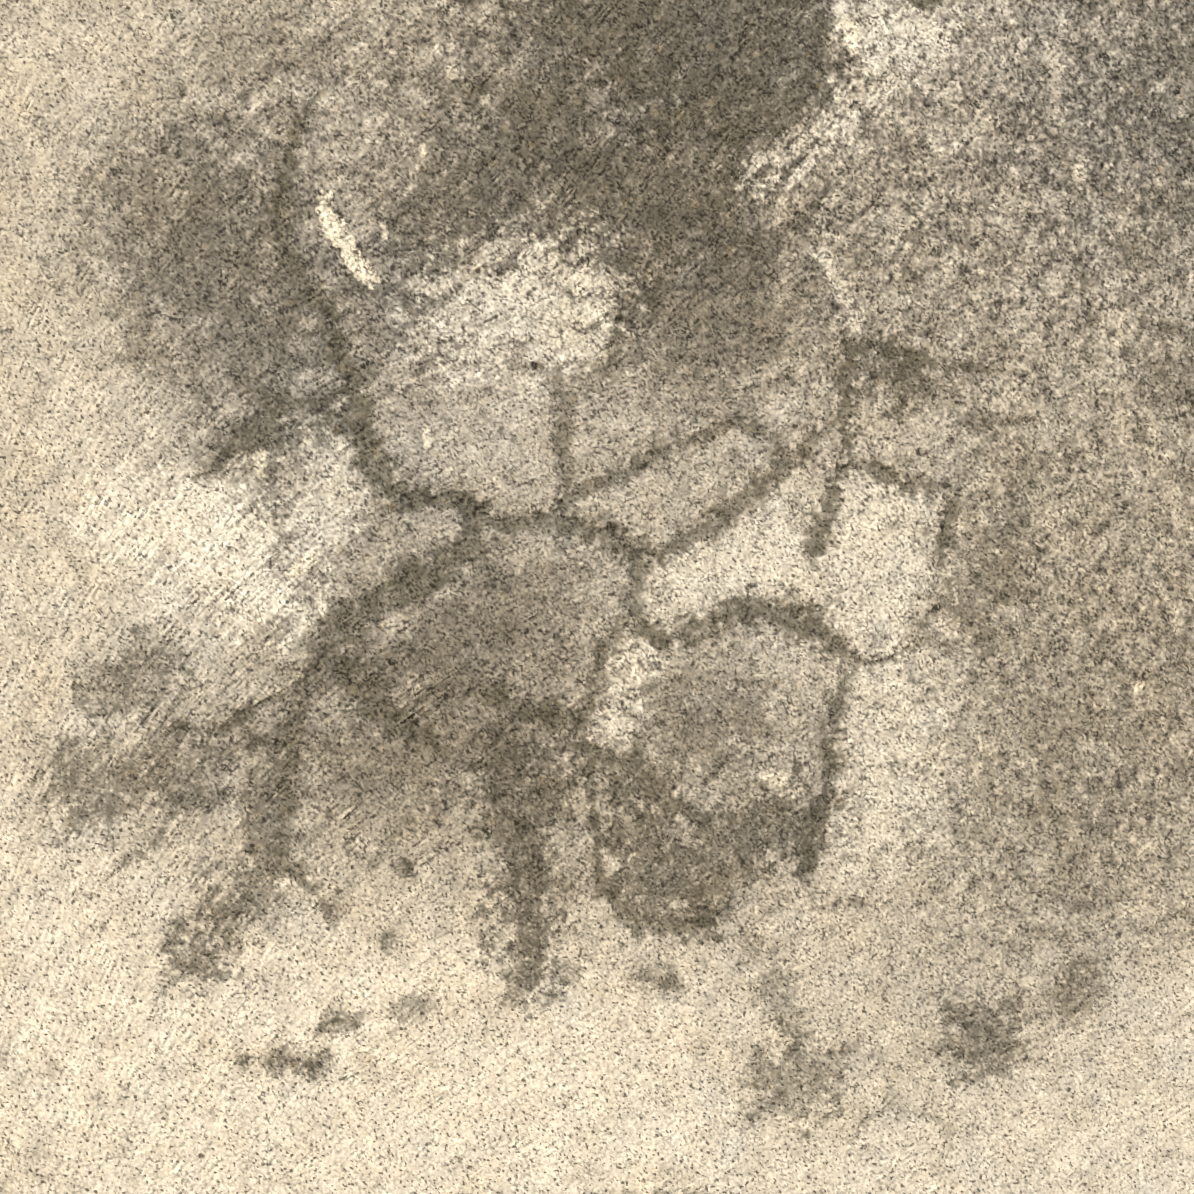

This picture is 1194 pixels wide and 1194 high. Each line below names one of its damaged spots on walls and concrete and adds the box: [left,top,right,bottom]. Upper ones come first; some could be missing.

water stain [8,0,400,1013]
crack [149,49,1048,951]
water stain [290,0,967,464]
water stain [292,441,1194,1154]
water stain [854,355,1009,449]